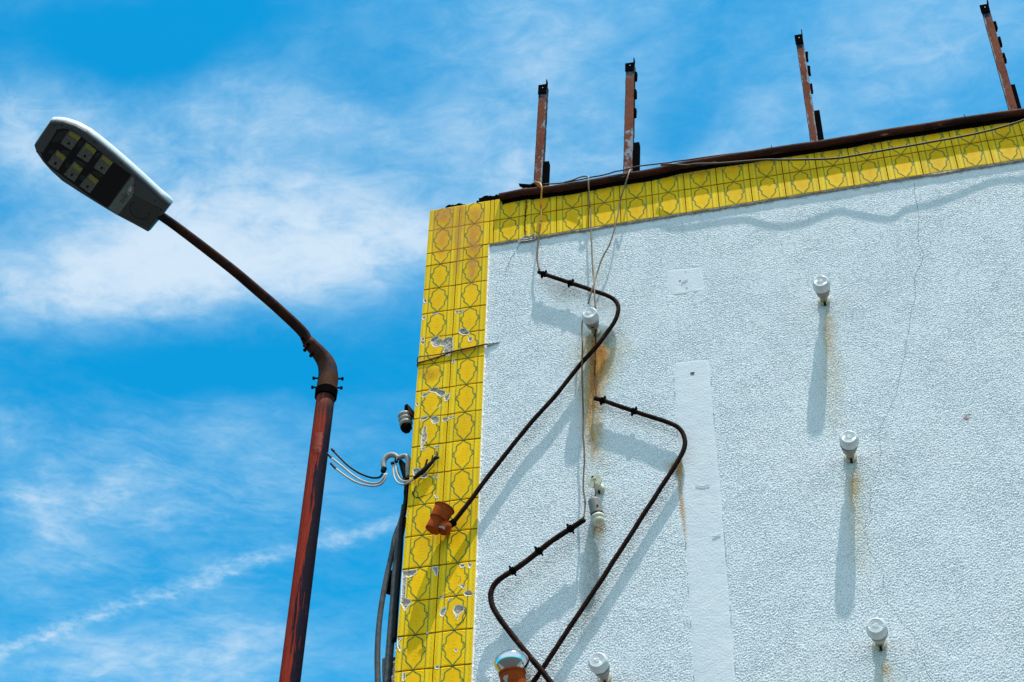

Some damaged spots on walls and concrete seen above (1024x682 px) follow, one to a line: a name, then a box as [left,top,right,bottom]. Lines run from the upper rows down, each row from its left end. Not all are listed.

spalling [420,328,473,363]
rust [586,337,613,439]
spalling [416,387,455,451]
spalling [400,569,417,611]
spalling [439,584,474,619]